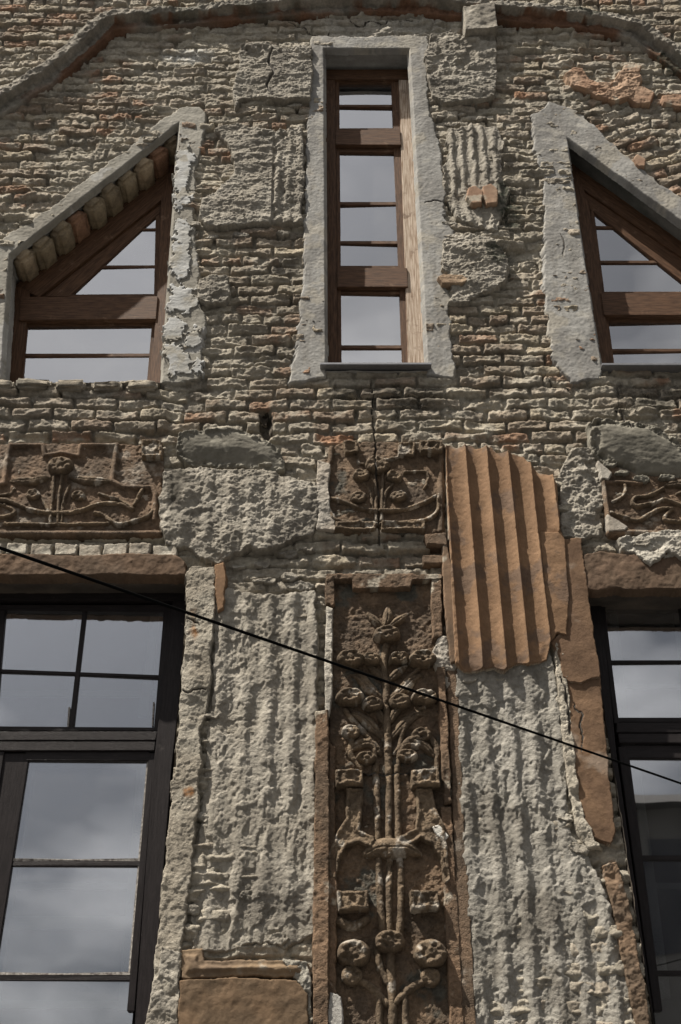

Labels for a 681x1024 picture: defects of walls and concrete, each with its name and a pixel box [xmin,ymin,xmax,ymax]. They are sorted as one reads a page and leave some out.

crack [266,49,275,95]
flaking render [563,63,681,113]
peeling [160,144,219,380]
crack [370,384,380,545]
flaking render [558,447,681,567]